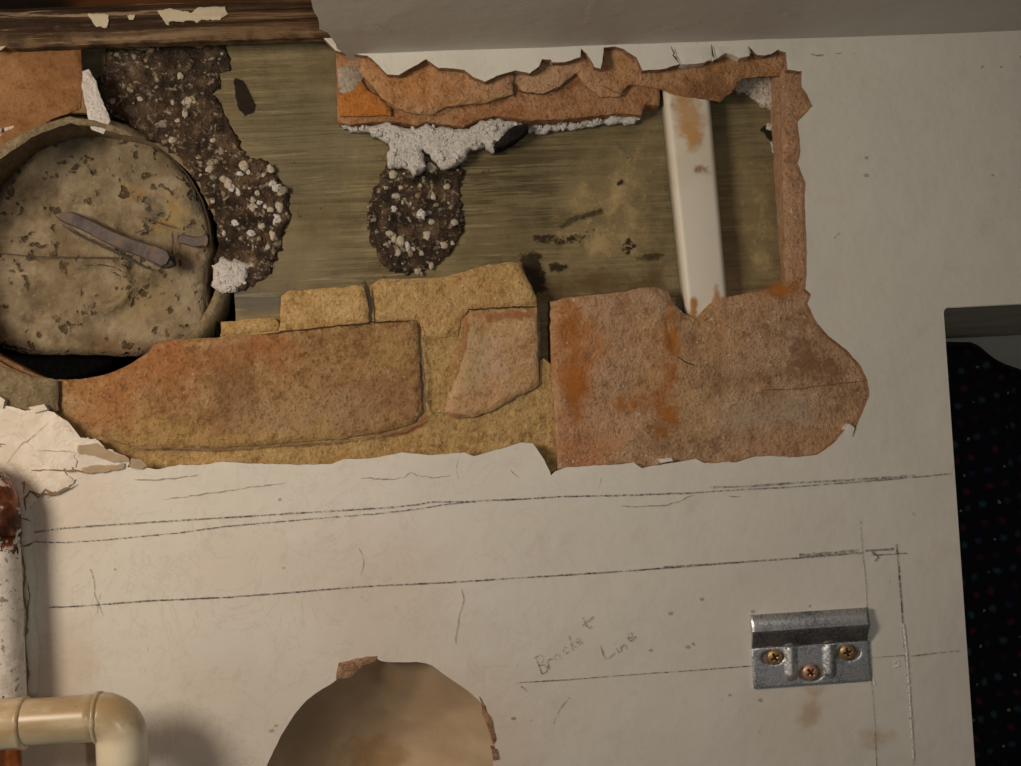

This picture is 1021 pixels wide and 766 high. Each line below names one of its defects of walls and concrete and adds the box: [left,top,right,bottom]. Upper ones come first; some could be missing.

peeling [131,47,199,152]
peeling [188,138,289,271]
spalling [336,46,866,470]
peeling [0,381,147,508]
crack [0,422,89,684]
peeling [336,656,377,679]
peeling [479,696,500,761]